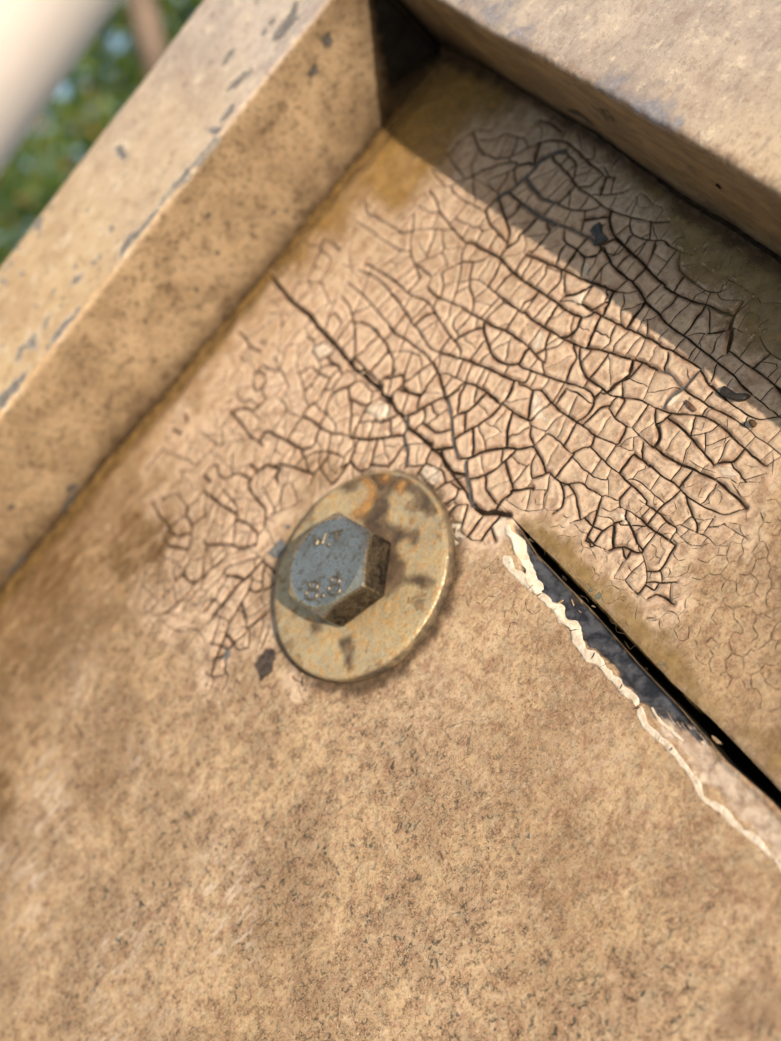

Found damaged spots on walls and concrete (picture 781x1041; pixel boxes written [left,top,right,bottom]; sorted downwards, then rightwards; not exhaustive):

rust [354,474,406,516]